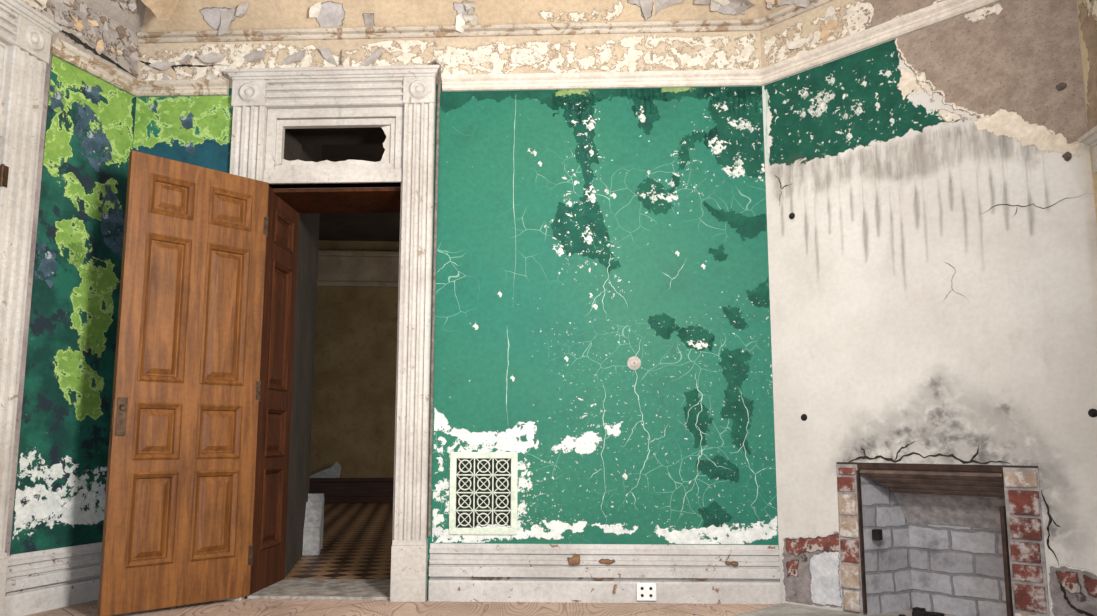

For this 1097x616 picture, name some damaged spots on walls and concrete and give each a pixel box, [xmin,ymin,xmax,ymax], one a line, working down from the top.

peeling [22,0,944,81]
crack [510,110,518,233]
flaking render [440,0,1097,322]
peeling [34,56,232,421]
crack [588,254,628,316]
crack [503,332,511,419]
peeling [12,447,107,539]
peeling [432,277,842,610]
crack [591,343,765,527]
crack [848,440,1012,465]
flaking render [1047,564,1097,616]